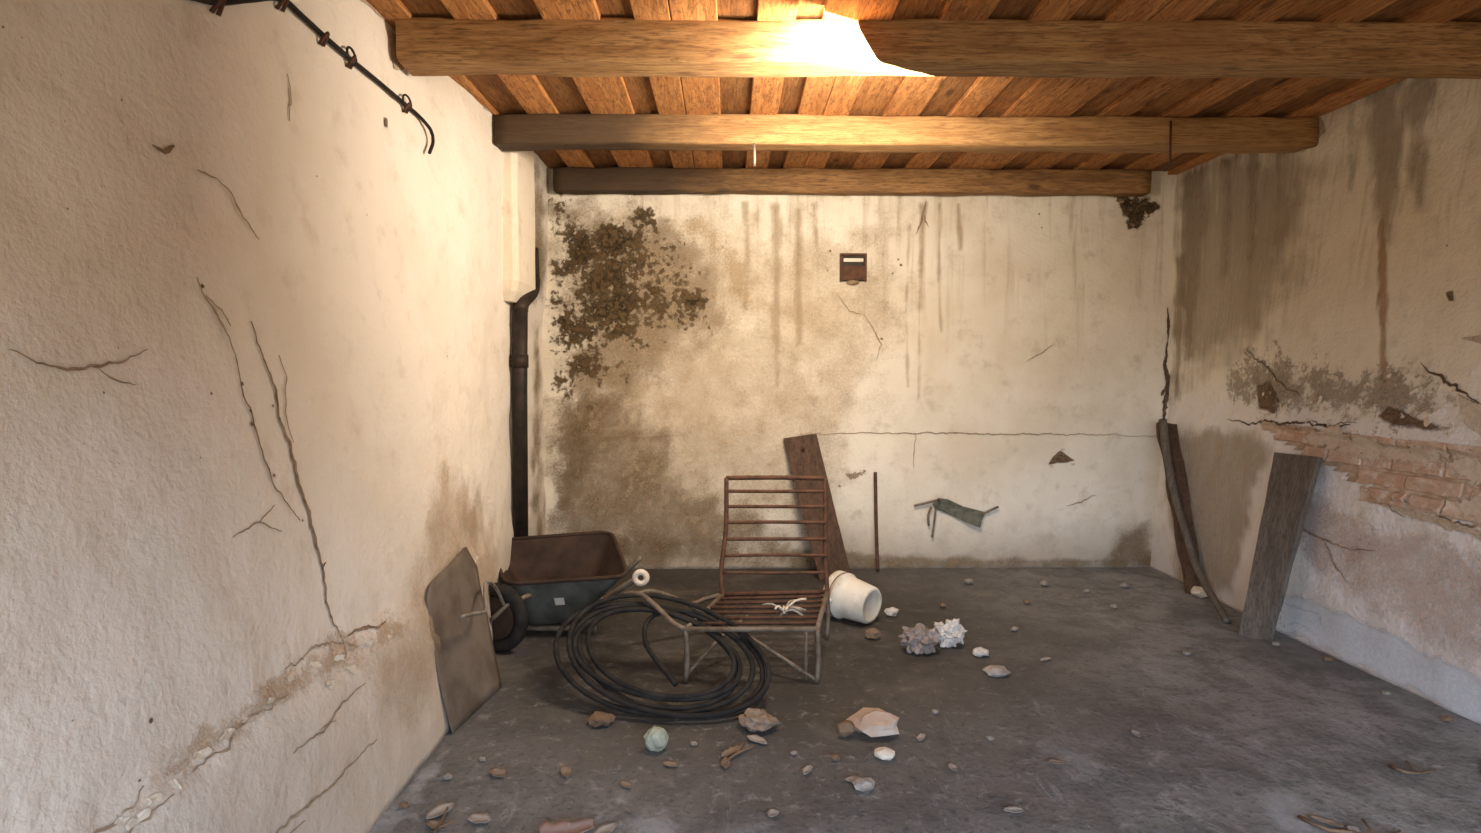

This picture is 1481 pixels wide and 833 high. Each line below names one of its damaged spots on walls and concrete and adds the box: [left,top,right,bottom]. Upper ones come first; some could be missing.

water stain [1174,153,1298,356]
crack [8,349,148,385]
crack [196,277,386,754]
water stain [533,194,763,567]
flaking render [1227,341,1481,539]
flaking render [94,622,403,833]
crack [277,739,377,833]